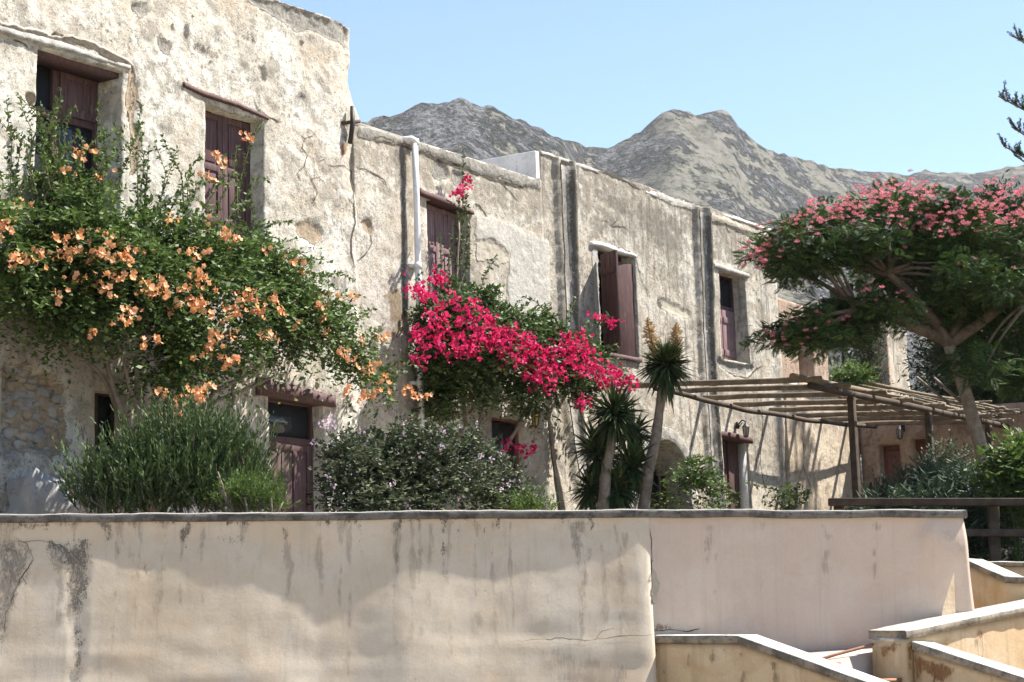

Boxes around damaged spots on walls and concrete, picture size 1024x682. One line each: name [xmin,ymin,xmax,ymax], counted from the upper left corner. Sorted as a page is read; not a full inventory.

crack [254,100,388,267]
peeling [1,362,72,460]
leakage [0,541,31,631]
leakage [46,524,102,682]
crack [513,532,700,641]